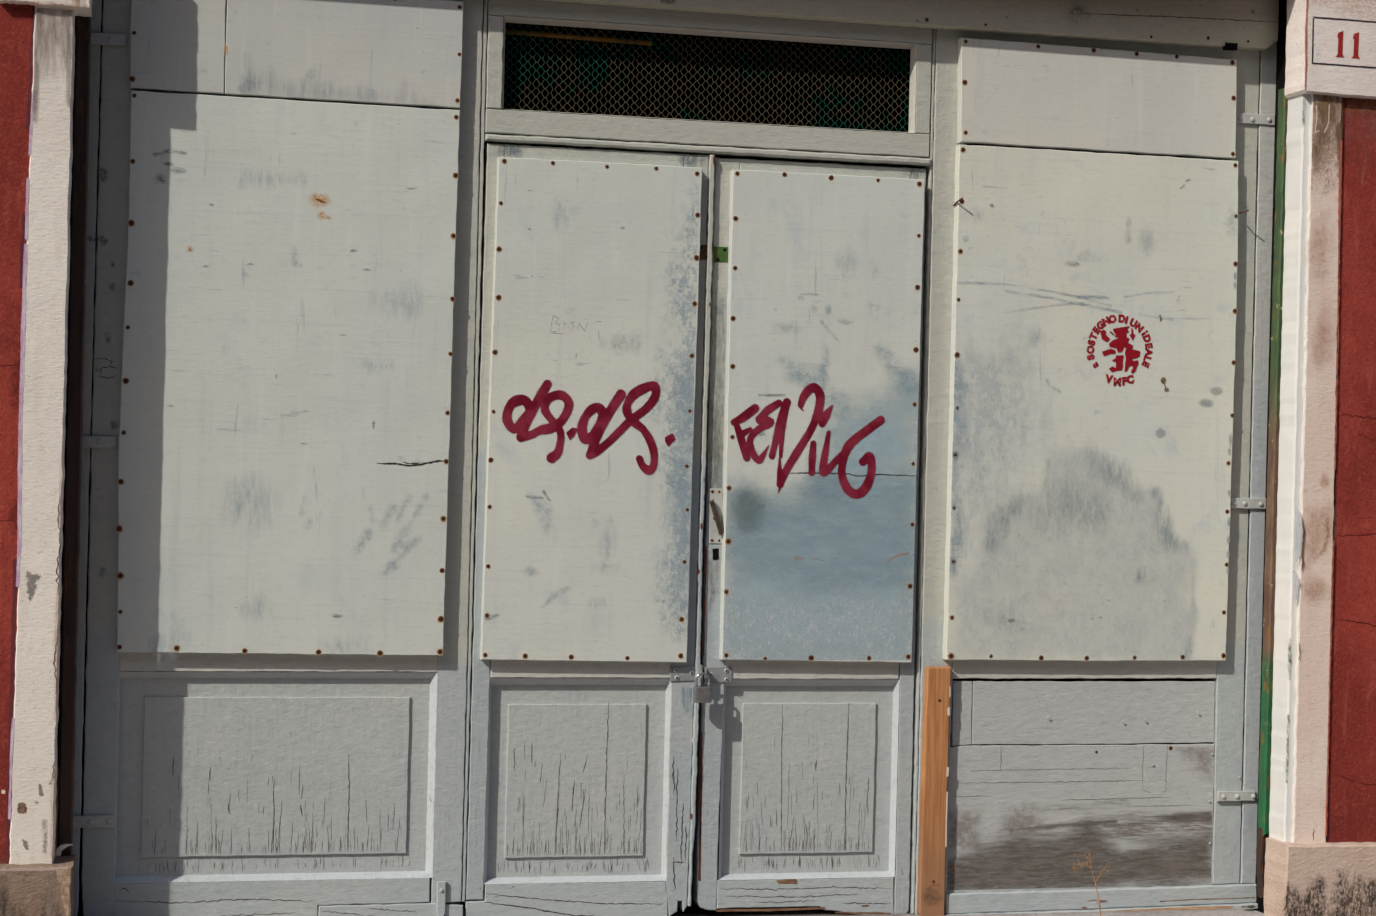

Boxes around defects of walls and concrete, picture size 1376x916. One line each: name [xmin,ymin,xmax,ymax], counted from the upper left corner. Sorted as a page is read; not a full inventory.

leakage [1284,874,1376,916]